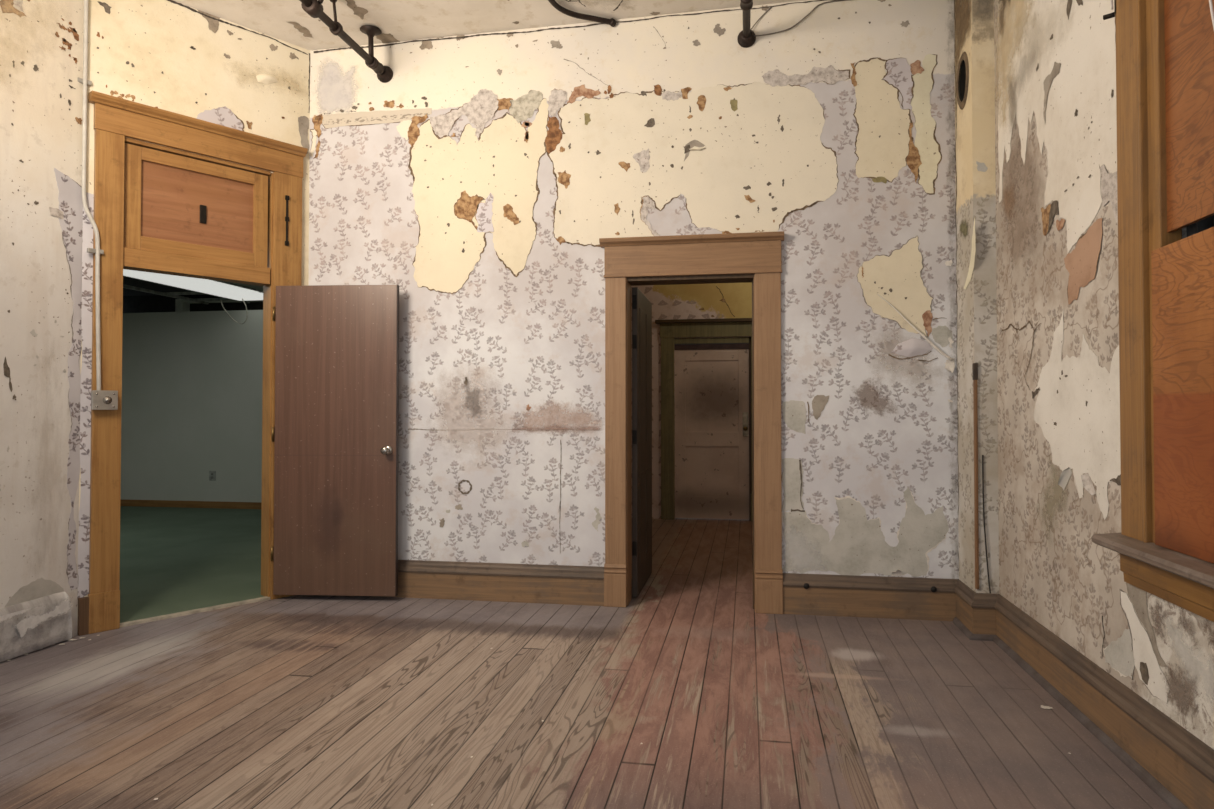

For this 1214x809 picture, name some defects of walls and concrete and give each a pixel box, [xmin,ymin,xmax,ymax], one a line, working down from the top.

rust [545,116,562,154]
peeling [1034,310,1121,520]
flaking render [781,458,949,577]
flaking render [5,578,64,607]
flaking render [1103,583,1170,703]
leakage [1166,667,1195,712]